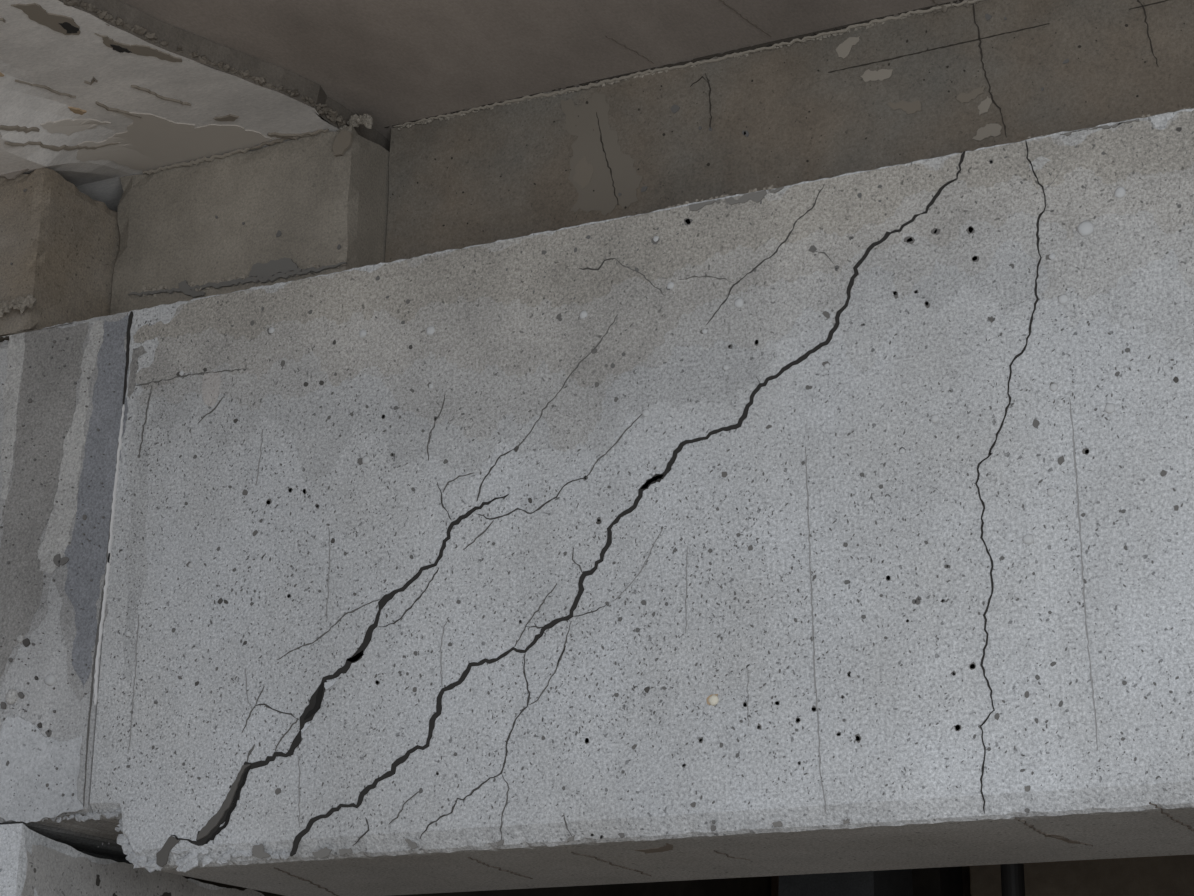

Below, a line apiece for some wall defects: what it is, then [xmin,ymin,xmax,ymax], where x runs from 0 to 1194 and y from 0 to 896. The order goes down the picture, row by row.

spalling [11,0,373,132]
crack [596,112,618,203]
crack [690,73,712,127]
crack [118,311,241,455]
water stain [0,85,1194,701]
crack [973,3,1065,814]
crack [171,151,965,896]
crack [83,499,113,807]
spalling [196,764,250,840]
spalling [231,844,290,861]
crack [1015,818,1093,847]